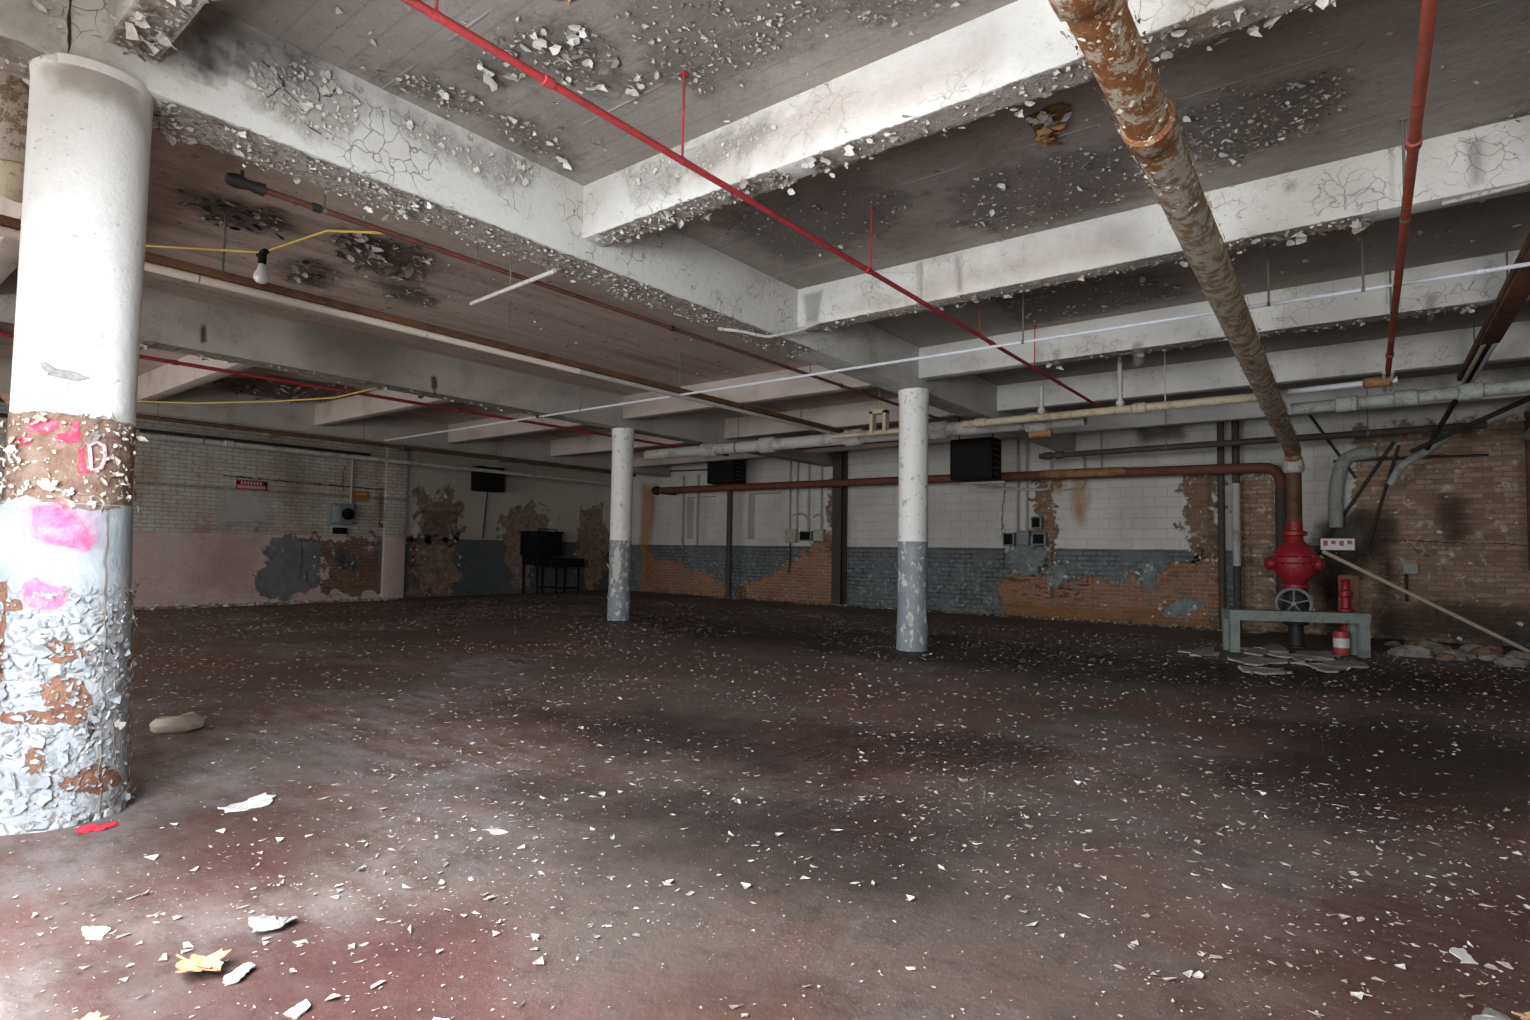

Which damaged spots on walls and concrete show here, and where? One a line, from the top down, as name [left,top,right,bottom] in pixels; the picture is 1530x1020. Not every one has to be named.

peeling [92,0,209,65]
crack [261,60,360,139]
peeling [152,0,965,378]
peeling [595,0,1477,450]
peeling [0,393,149,513]
peeling [252,527,383,602]
peeling [403,484,466,597]
peeling [496,500,560,590]
peeling [571,477,833,612]
peeling [998,473,1335,636]
peeling [1347,415,1530,643]
peeling [0,582,139,828]